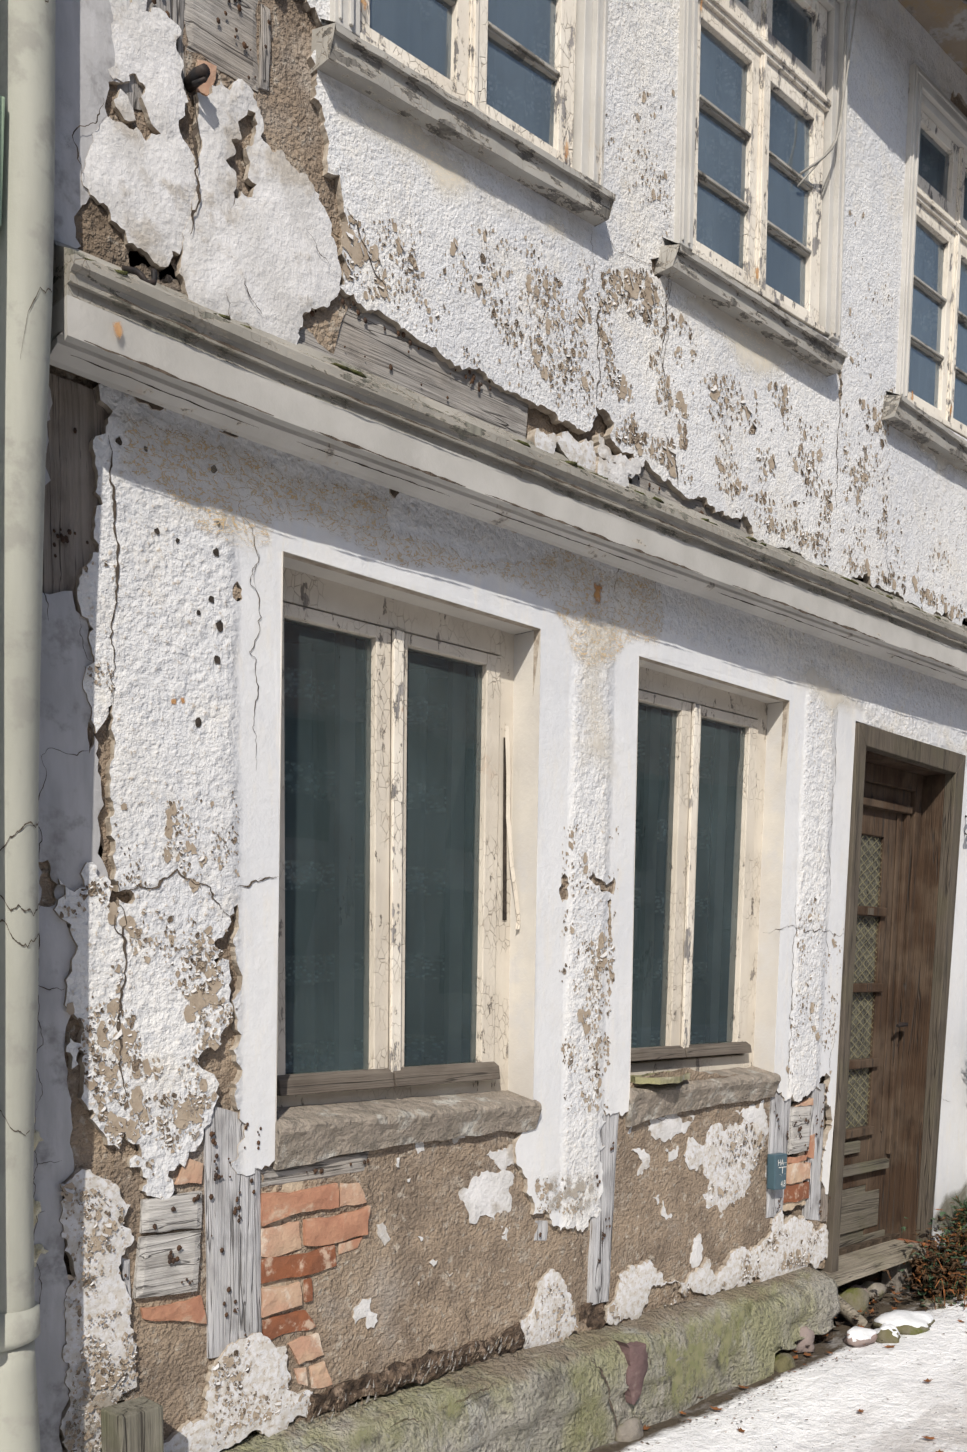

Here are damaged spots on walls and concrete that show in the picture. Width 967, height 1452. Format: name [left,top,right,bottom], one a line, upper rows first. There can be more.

spalling [49,0,967,621]
peeling [87,659,115,693]
spalling [196,596,223,632]
crack [232,484,262,770]
crack [0,748,82,852]
crack [0,895,64,1304]
crack [114,868,277,1098]
spalling [39,716,828,1452]
peeling [786,890,844,1084]